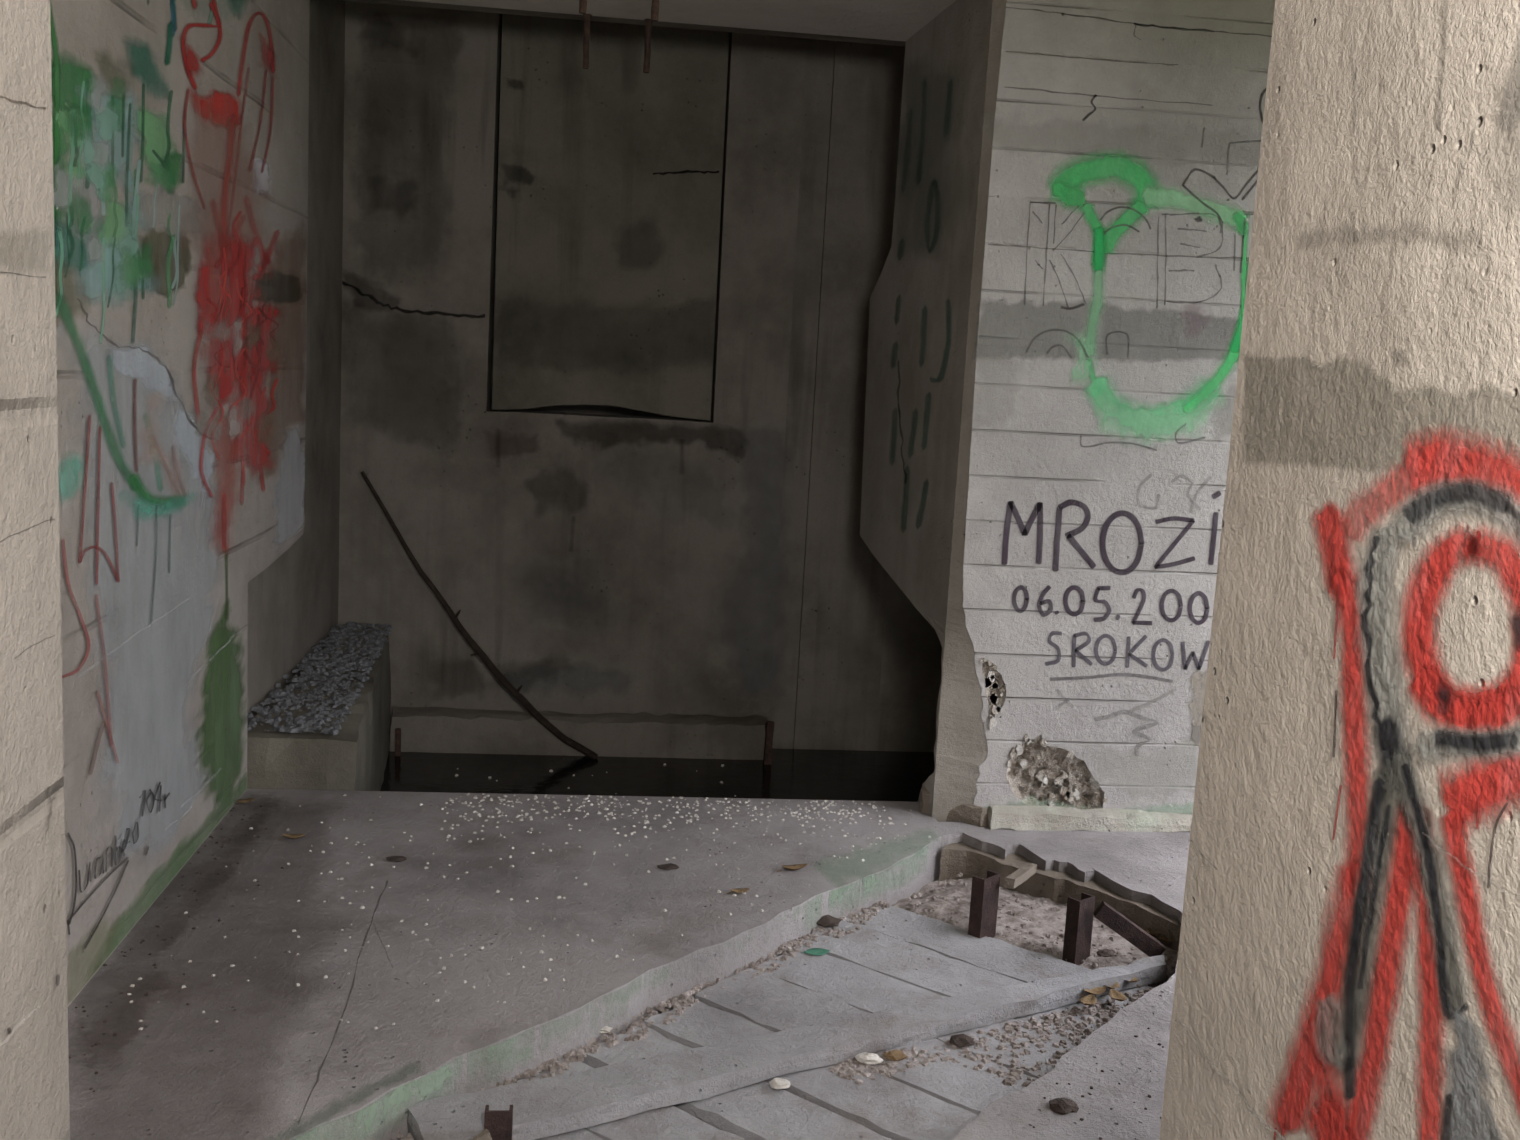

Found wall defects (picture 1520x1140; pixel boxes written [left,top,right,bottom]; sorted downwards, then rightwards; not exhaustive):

crack [0,96,46,110]
crack [653,168,719,176]
crack [342,281,485,318]
crack [0,519,55,543]
spalling [979,658,1006,730]
spalling [1006,734,1107,809]
crack [298,881,388,1122]